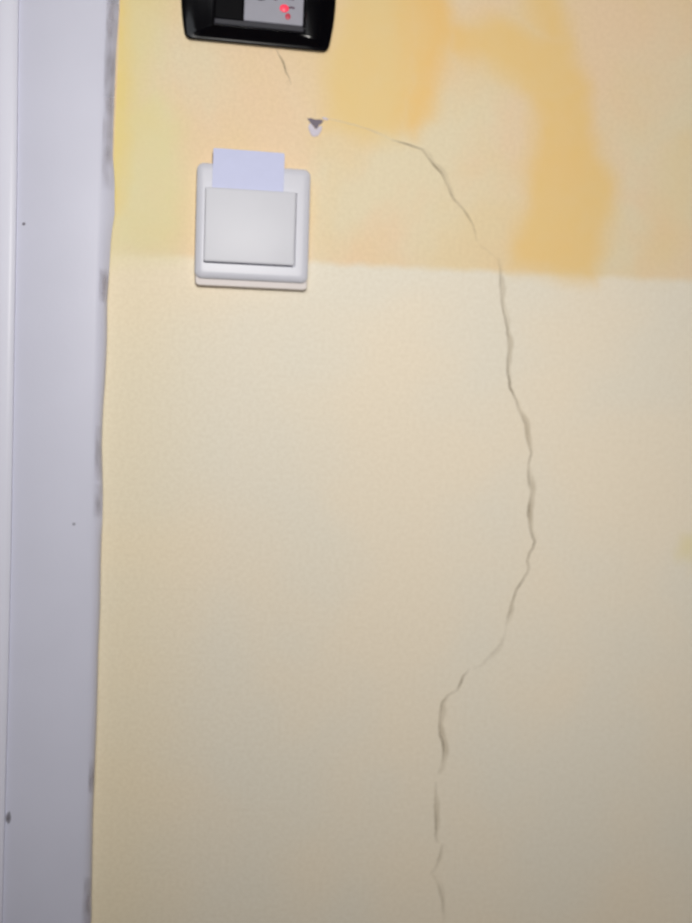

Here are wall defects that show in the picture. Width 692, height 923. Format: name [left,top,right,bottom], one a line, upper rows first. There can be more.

damp [109,0,213,282]
crack [275,48,292,86]
damp [307,0,692,296]
crack [328,118,538,923]